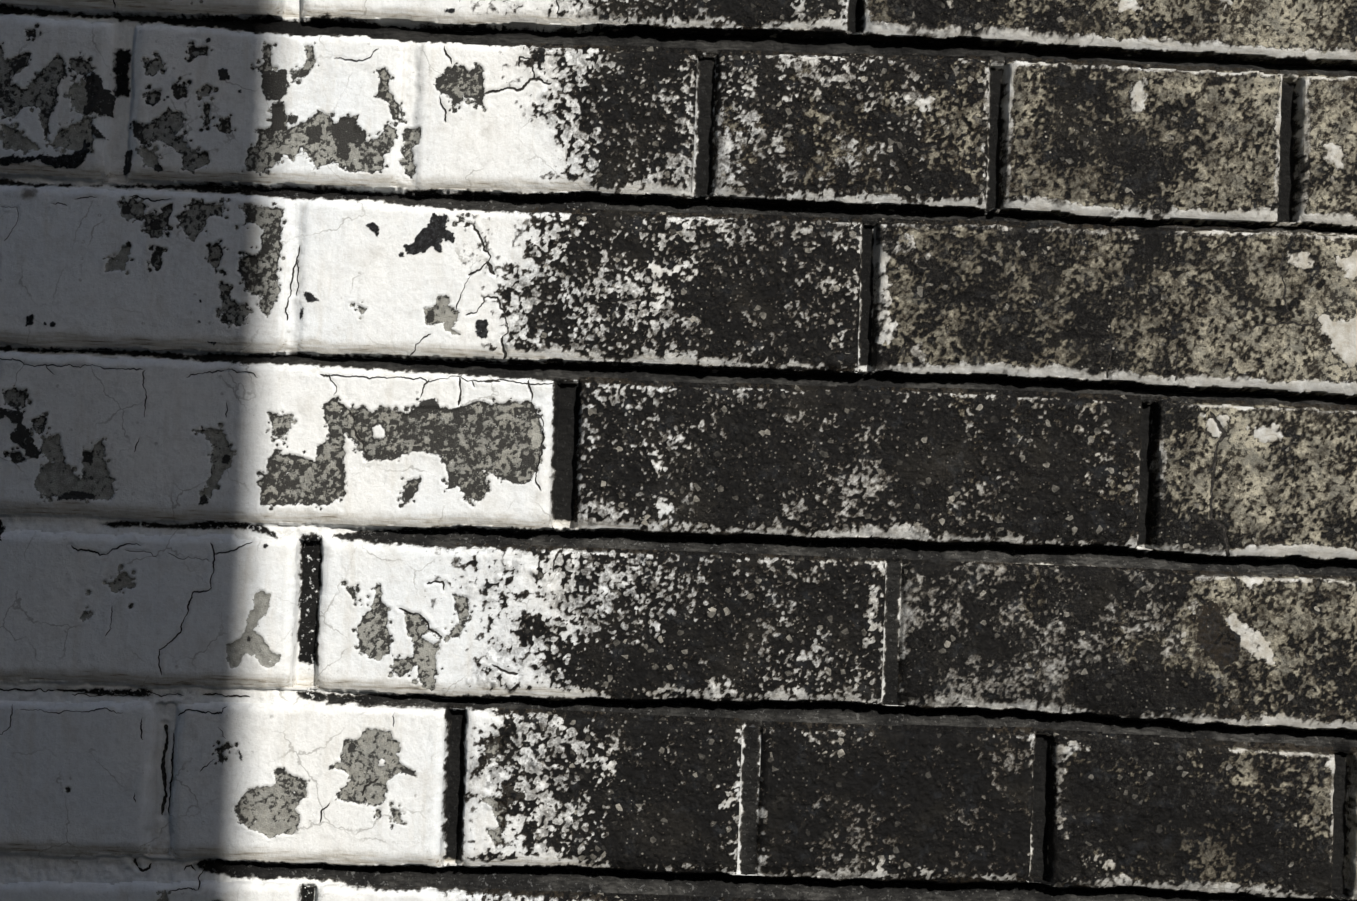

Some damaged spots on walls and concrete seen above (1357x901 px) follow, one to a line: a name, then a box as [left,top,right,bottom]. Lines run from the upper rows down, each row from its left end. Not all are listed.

peeling [0,42,116,155]
peeling [123,38,241,175]
peeling [241,41,407,176]
crack [130,194,170,202]
peeling [103,196,287,328]
crack [0,358,147,452]
peeling [256,397,546,510]
crack [0,542,252,815]
peeling [341,581,473,691]
peeling [231,767,310,838]
peeling [329,728,416,830]
crack [133,858,206,891]